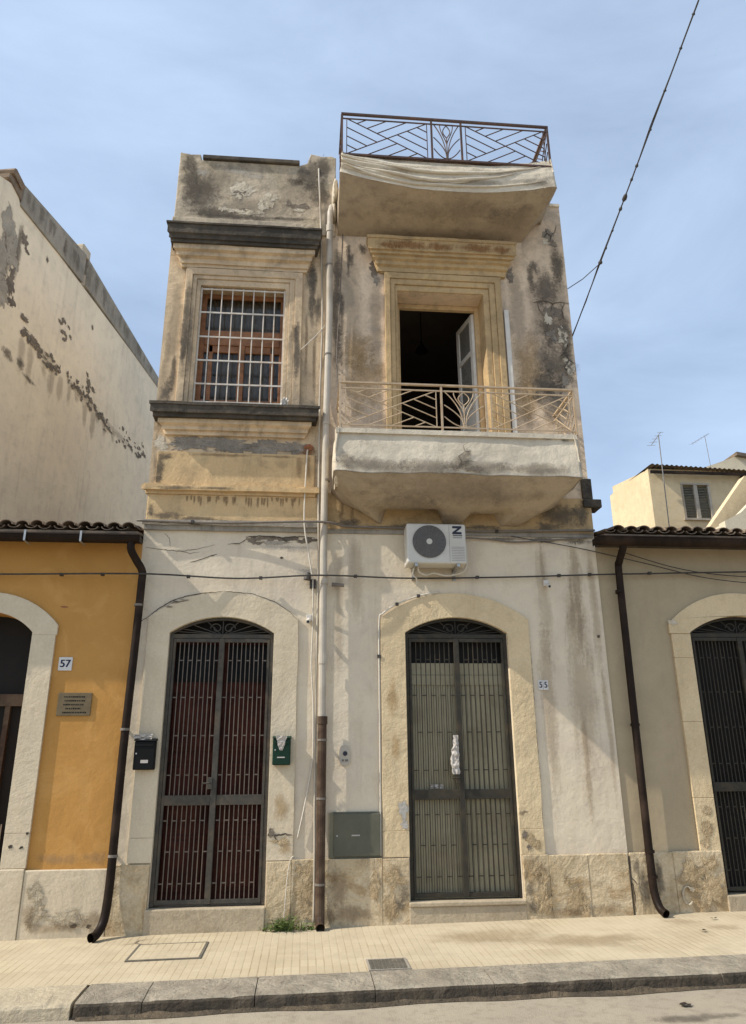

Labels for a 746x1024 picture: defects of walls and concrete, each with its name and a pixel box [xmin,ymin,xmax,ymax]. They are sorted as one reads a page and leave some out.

damp [184,157,304,220]
damp [290,161,329,201]
damp [528,255,562,303]
flaking render [0,203,314,458]
damp [534,316,571,417]
flaking render [543,307,575,388]
damp [341,450,557,475]
crack [146,522,314,562]
flaking render [246,536,318,559]